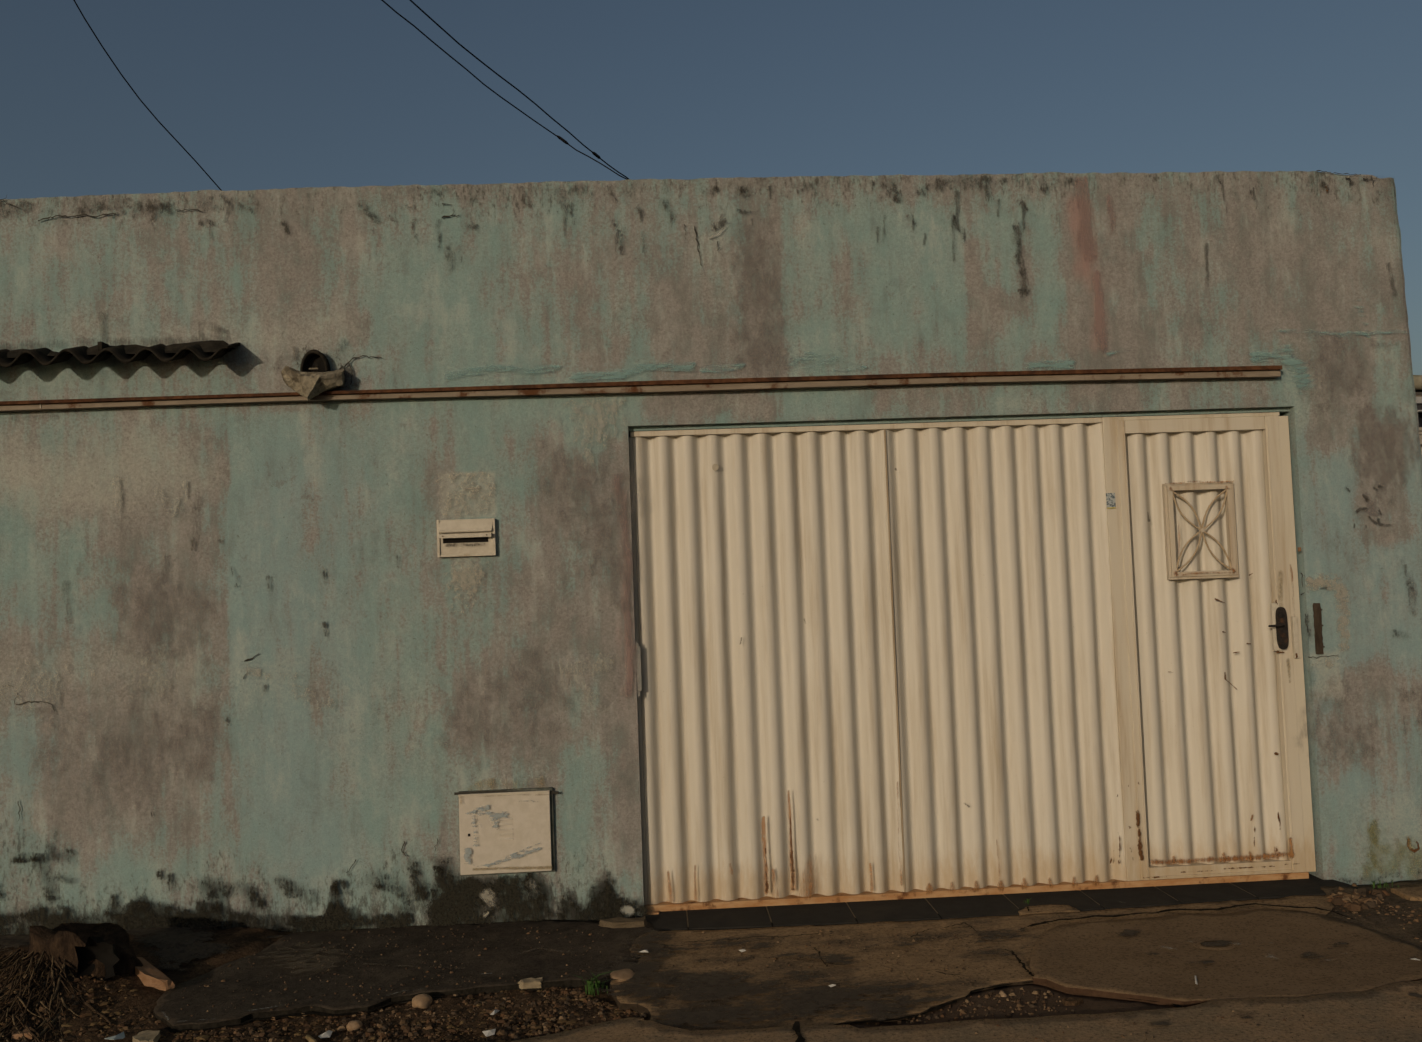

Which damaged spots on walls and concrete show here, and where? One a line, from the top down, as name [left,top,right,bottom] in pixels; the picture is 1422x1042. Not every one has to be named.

leakage [873,175,1007,224]
corrosion [761,790,812,898]
corrosion [1110,810,1294,878]
leakage [0,845,652,974]
crack [840,903,1353,1025]
crack [792,1021,806,1042]